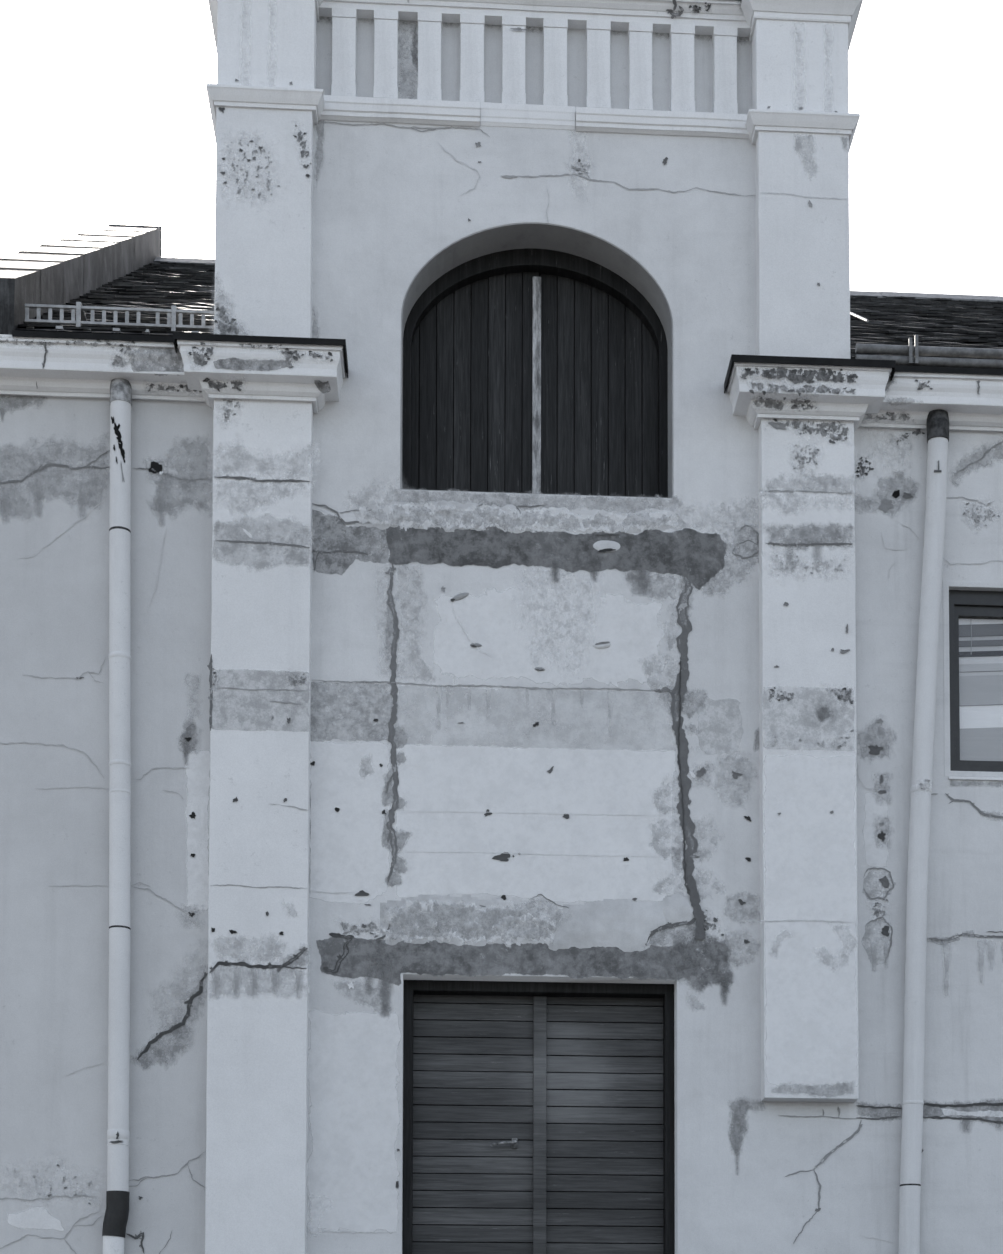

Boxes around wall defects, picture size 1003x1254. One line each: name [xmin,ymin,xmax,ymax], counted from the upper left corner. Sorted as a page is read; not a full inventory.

crack [318,121,841,220]
peeling [740,367,858,469]
flaking render [147,461,165,474]
peeling [312,510,727,592]
flaking render [211,669,392,741]
crack [0,450,721,1068]
flaking render [689,695,743,779]
crack [931,793,1003,818]
peeling [316,922,697,1015]
flaking render [862,867,895,970]
crack [927,930,1003,994]
crack [778,1107,863,1244]